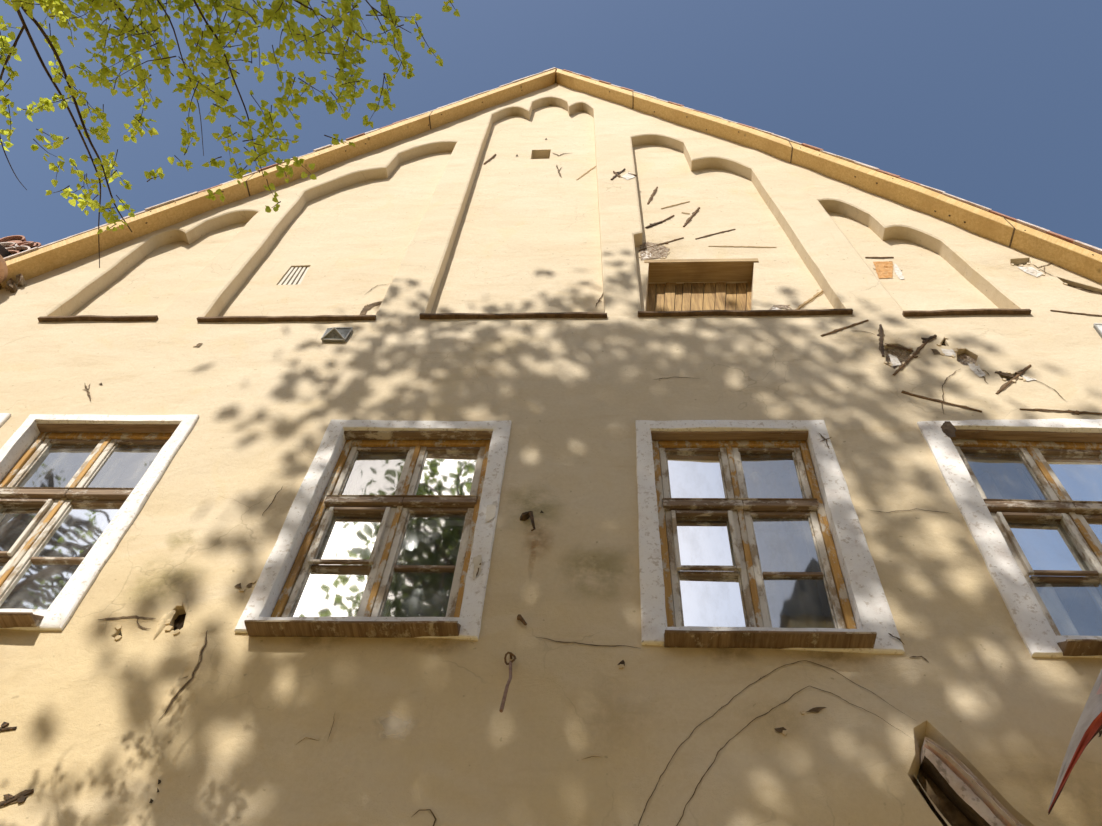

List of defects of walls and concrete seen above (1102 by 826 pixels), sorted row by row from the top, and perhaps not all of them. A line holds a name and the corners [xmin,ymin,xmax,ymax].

spalling [883,343,913,369]
spalling [931,336,986,377]
spalling [1001,371,1037,383]
spalling [165,602,186,635]
crack [155,630,210,722]
crack [638,660,913,826]